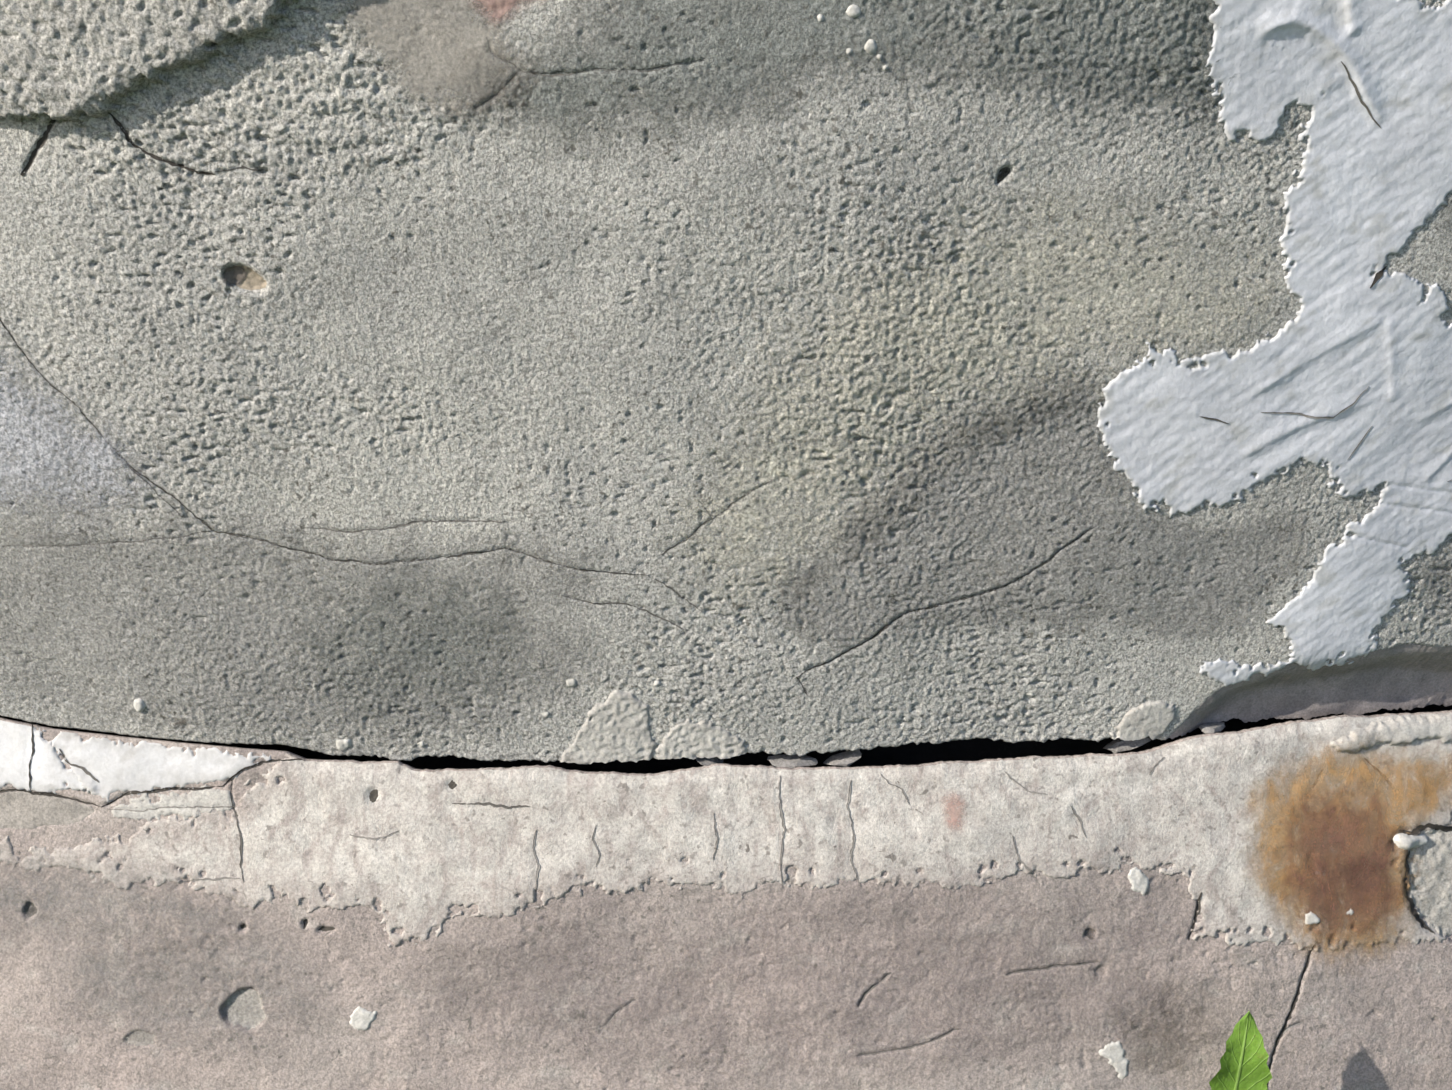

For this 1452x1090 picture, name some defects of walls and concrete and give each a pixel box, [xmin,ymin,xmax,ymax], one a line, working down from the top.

peeling [0,0,299,127]
peeling [349,0,511,111]
crack [20,119,56,176]
crack [109,113,262,175]
crack [0,319,770,629]
crack [0,704,1452,888]
peeling [0,643,1452,952]
rust [1252,755,1450,948]
crack [1267,945,1314,1089]